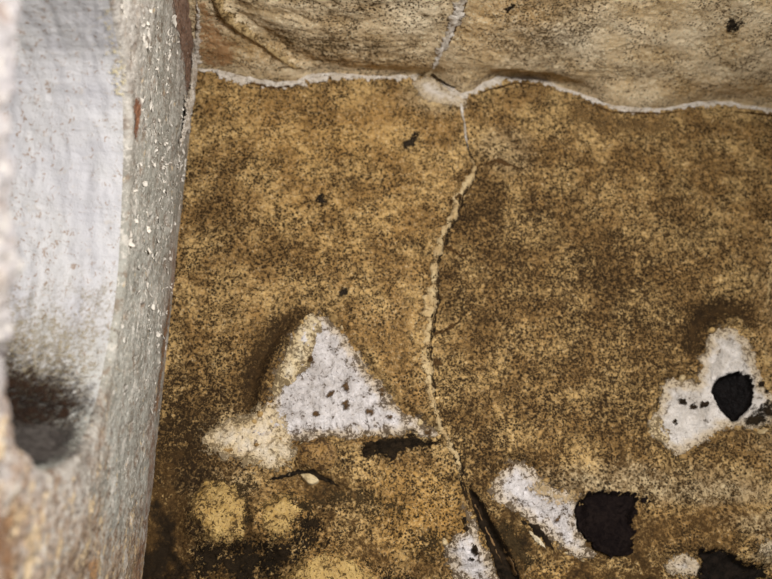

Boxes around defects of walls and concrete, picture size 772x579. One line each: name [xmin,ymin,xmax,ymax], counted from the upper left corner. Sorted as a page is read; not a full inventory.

crack [198,0,772,579]
leakage [3,300,105,433]
spalling [199,310,437,486]
spalling [647,324,772,459]
leakage [172,472,453,579]
spalling [438,502,499,579]
leakage [491,510,546,578]
spalling [486,455,597,562]
leakage [575,490,651,558]